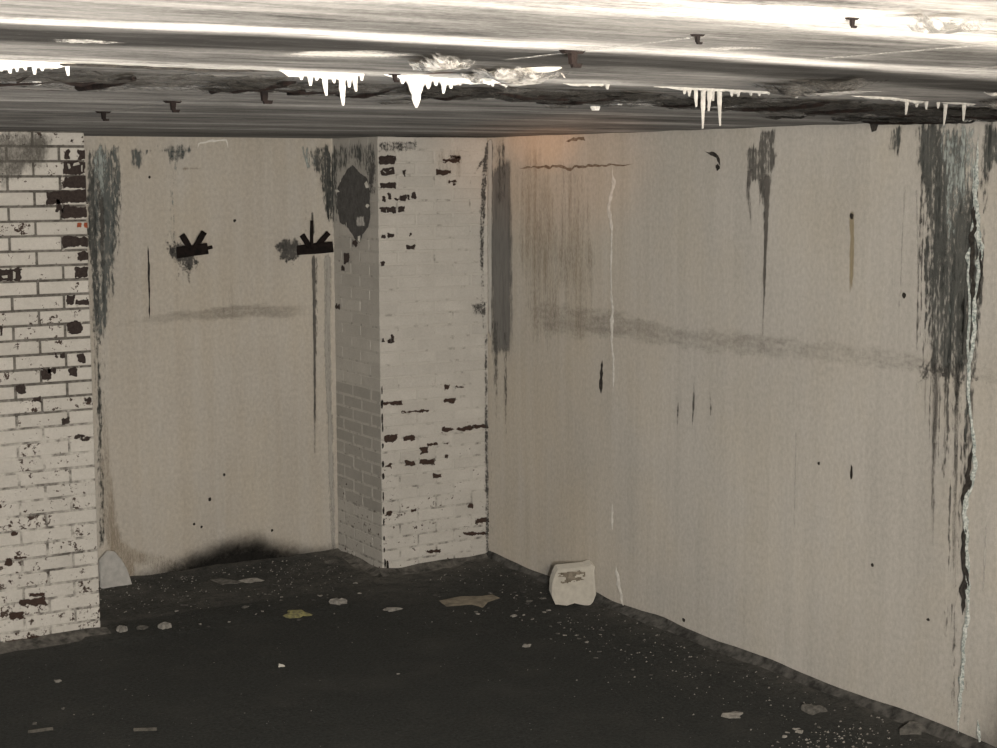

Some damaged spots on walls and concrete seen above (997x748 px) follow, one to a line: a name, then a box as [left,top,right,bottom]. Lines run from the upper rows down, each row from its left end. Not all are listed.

leakage [280,70,364,105]
leakage [384,74,508,108]
spalling [0,57,997,132]
leakage [654,86,770,129]
leakage [747,129,775,311]
peeling [0,267,22,282]
peeling [67,320,83,334]
leakage [87,146,121,508]
leakage [854,96,997,543]
peeling [41,352,87,380]
peeling [380,388,489,479]
peeling [8,591,47,623]